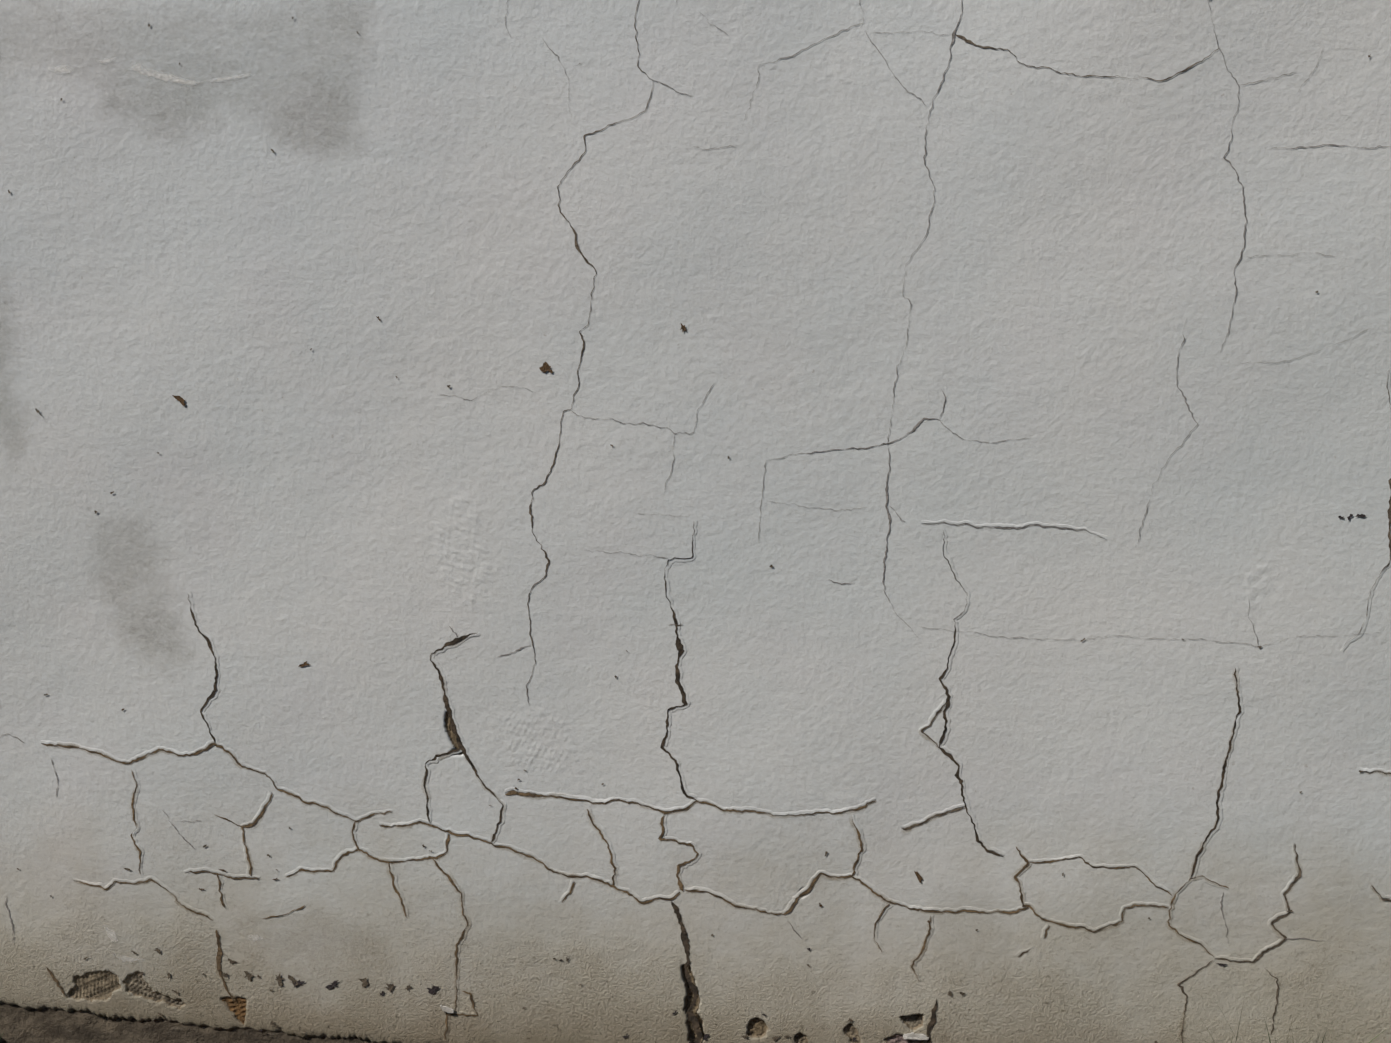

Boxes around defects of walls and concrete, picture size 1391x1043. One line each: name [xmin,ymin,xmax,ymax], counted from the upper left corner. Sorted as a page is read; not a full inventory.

crack [1269,143,1389,151]
crack [741,2,1322,617]
crack [498,1,714,703]
crack [1383,368,1391,409]
crack [1192,478,1391,652]
crack [41,519,1323,1043]
crack [1360,766,1391,774]
crack [1371,883,1391,901]
spalling [71,957,184,1016]
spalling [742,1013,807,1043]
spalling [845,1018,860,1042]
spalling [887,1014,929,1043]